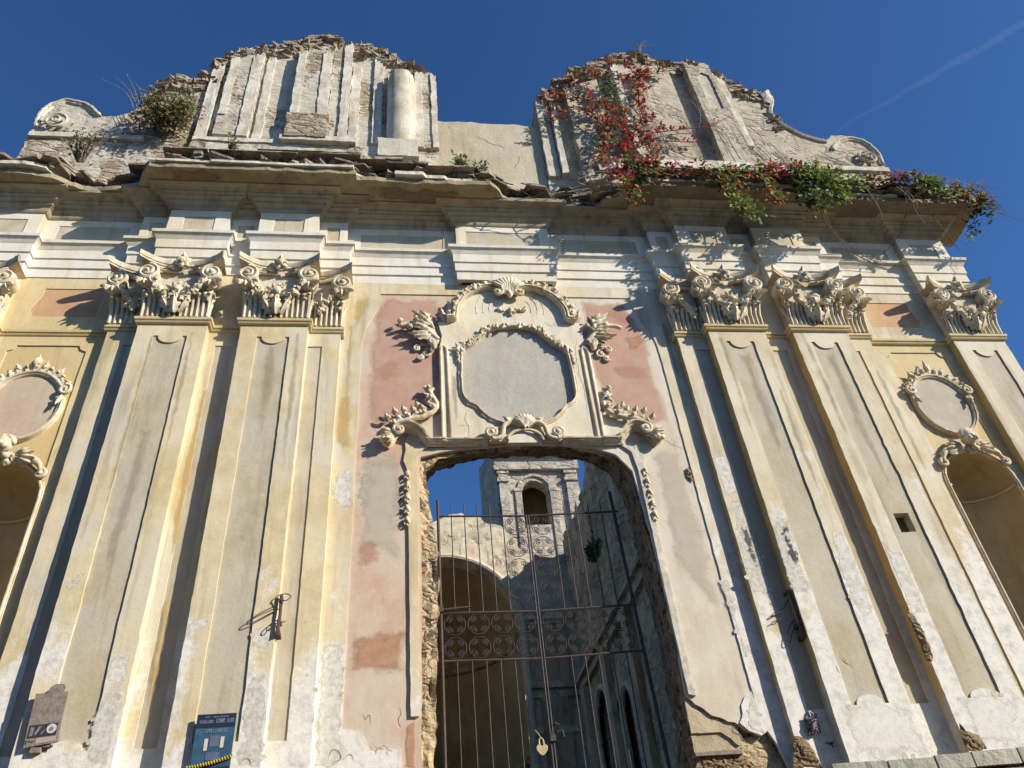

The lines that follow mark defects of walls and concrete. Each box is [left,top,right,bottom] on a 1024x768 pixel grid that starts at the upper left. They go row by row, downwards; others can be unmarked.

leakage [174,391,206,544]
peeling [330,454,403,556]
peeling [713,456,776,594]
peeling [774,519,811,592]
peeling [832,531,872,613]
peeling [305,645,345,767]